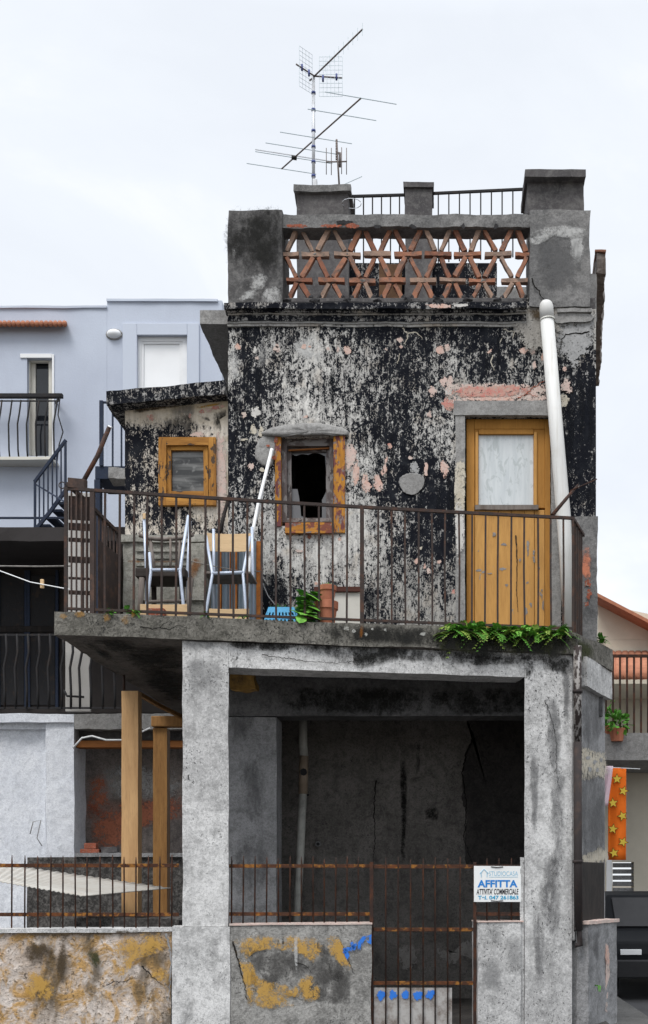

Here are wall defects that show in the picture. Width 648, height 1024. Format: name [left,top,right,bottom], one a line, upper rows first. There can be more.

water stain [226,209,284,268]
flaking render [532,228,583,260]
flaking render [427,376,547,417]
flaking render [345,443,392,492]
water stain [265,571,287,607]
water stain [232,642,293,651]
water stain [311,587,593,764]
water stain [400,744,420,857]
crack [461,735,474,862]
water stain [25,931,134,982]
crack [232,941,247,999]
peeling [235,936,350,1008]